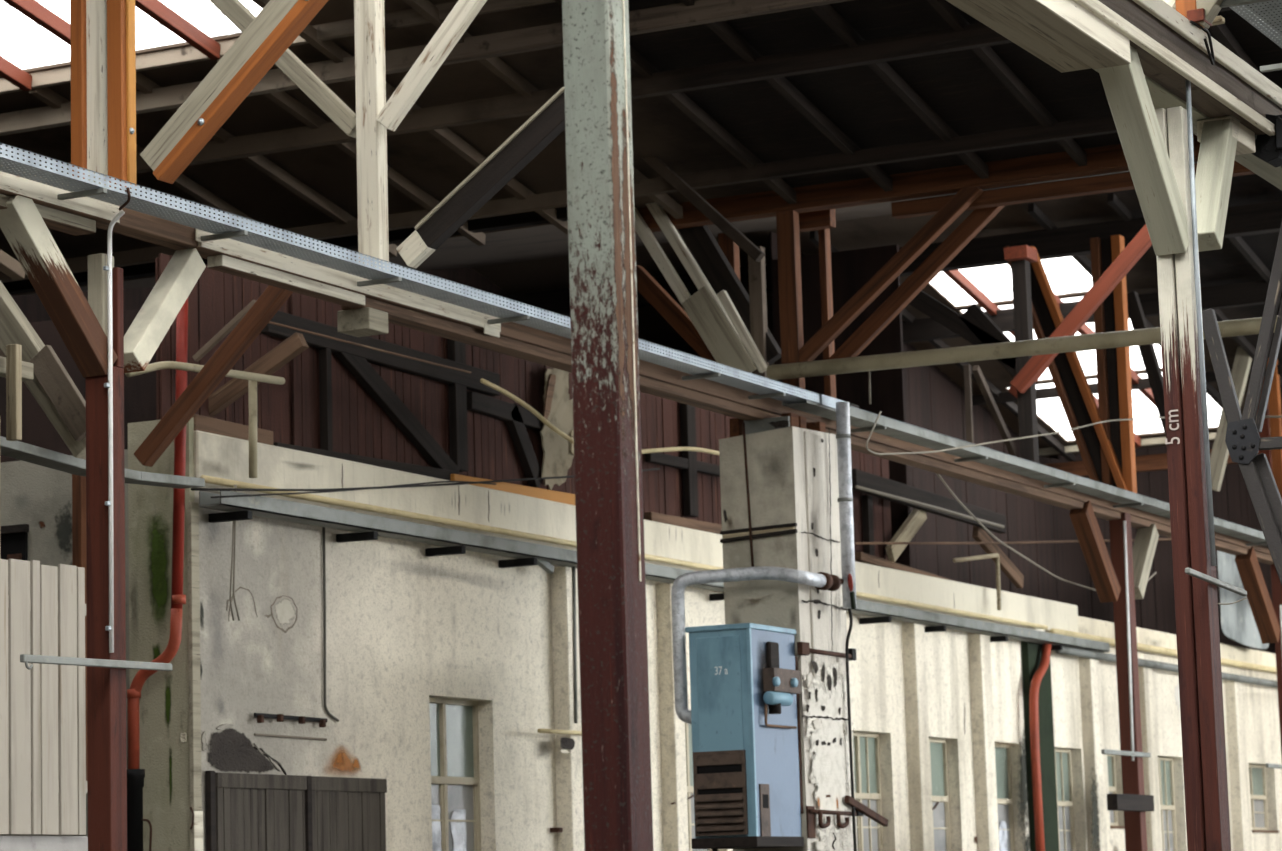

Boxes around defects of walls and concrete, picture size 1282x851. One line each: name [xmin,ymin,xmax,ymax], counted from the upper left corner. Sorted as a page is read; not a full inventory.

spalling [180,724,287,775]
spalling [559,737,575,753]
peeling [803,657,854,851]